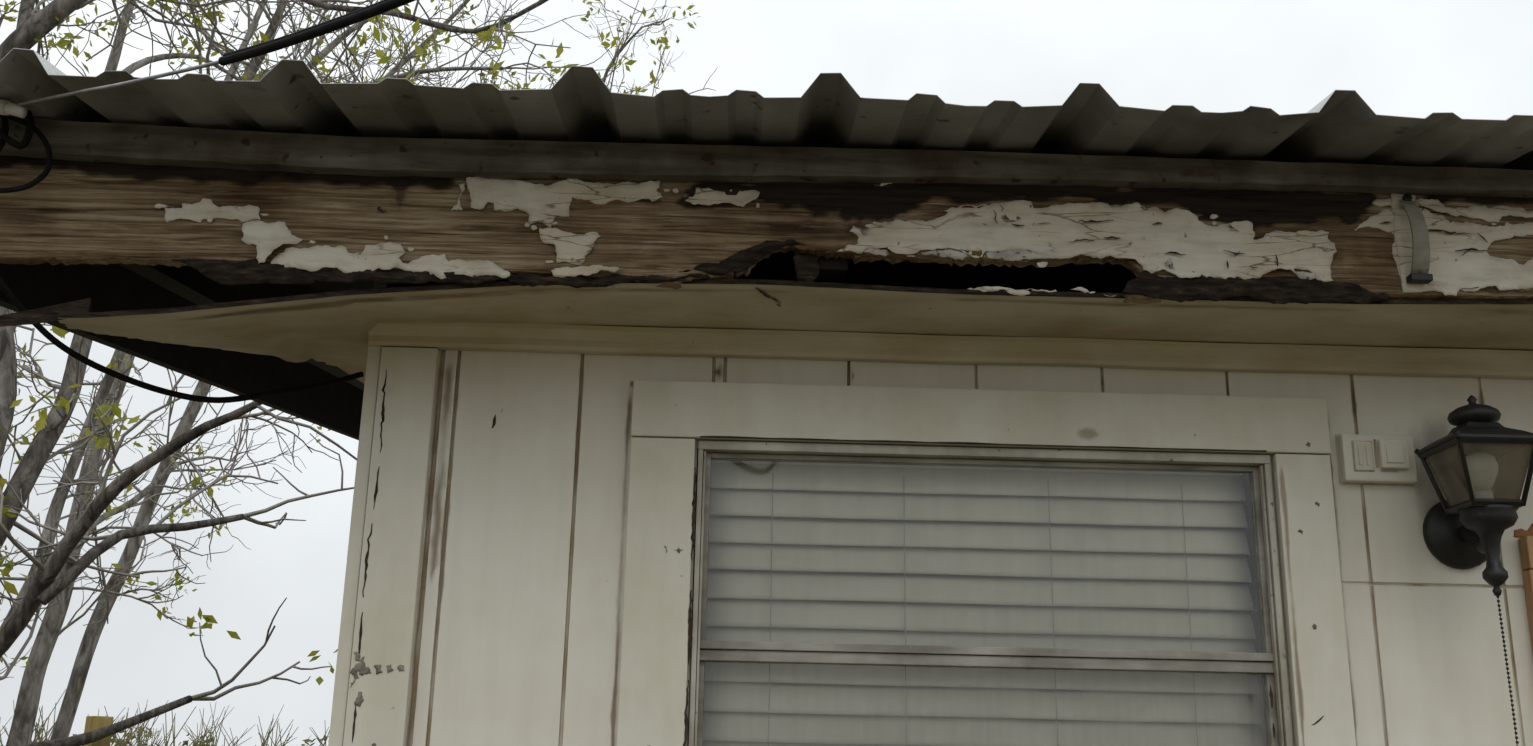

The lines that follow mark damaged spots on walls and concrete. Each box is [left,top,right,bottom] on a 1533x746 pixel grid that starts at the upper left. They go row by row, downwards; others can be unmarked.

peeling [154,198,510,279]
peeling [451,177,760,277]
peeling [837,200,1337,282]
peeling [1355,198,1533,296]
peeling [967,286,1116,296]
damp [429,443,451,595]
peeling [350,652,404,707]